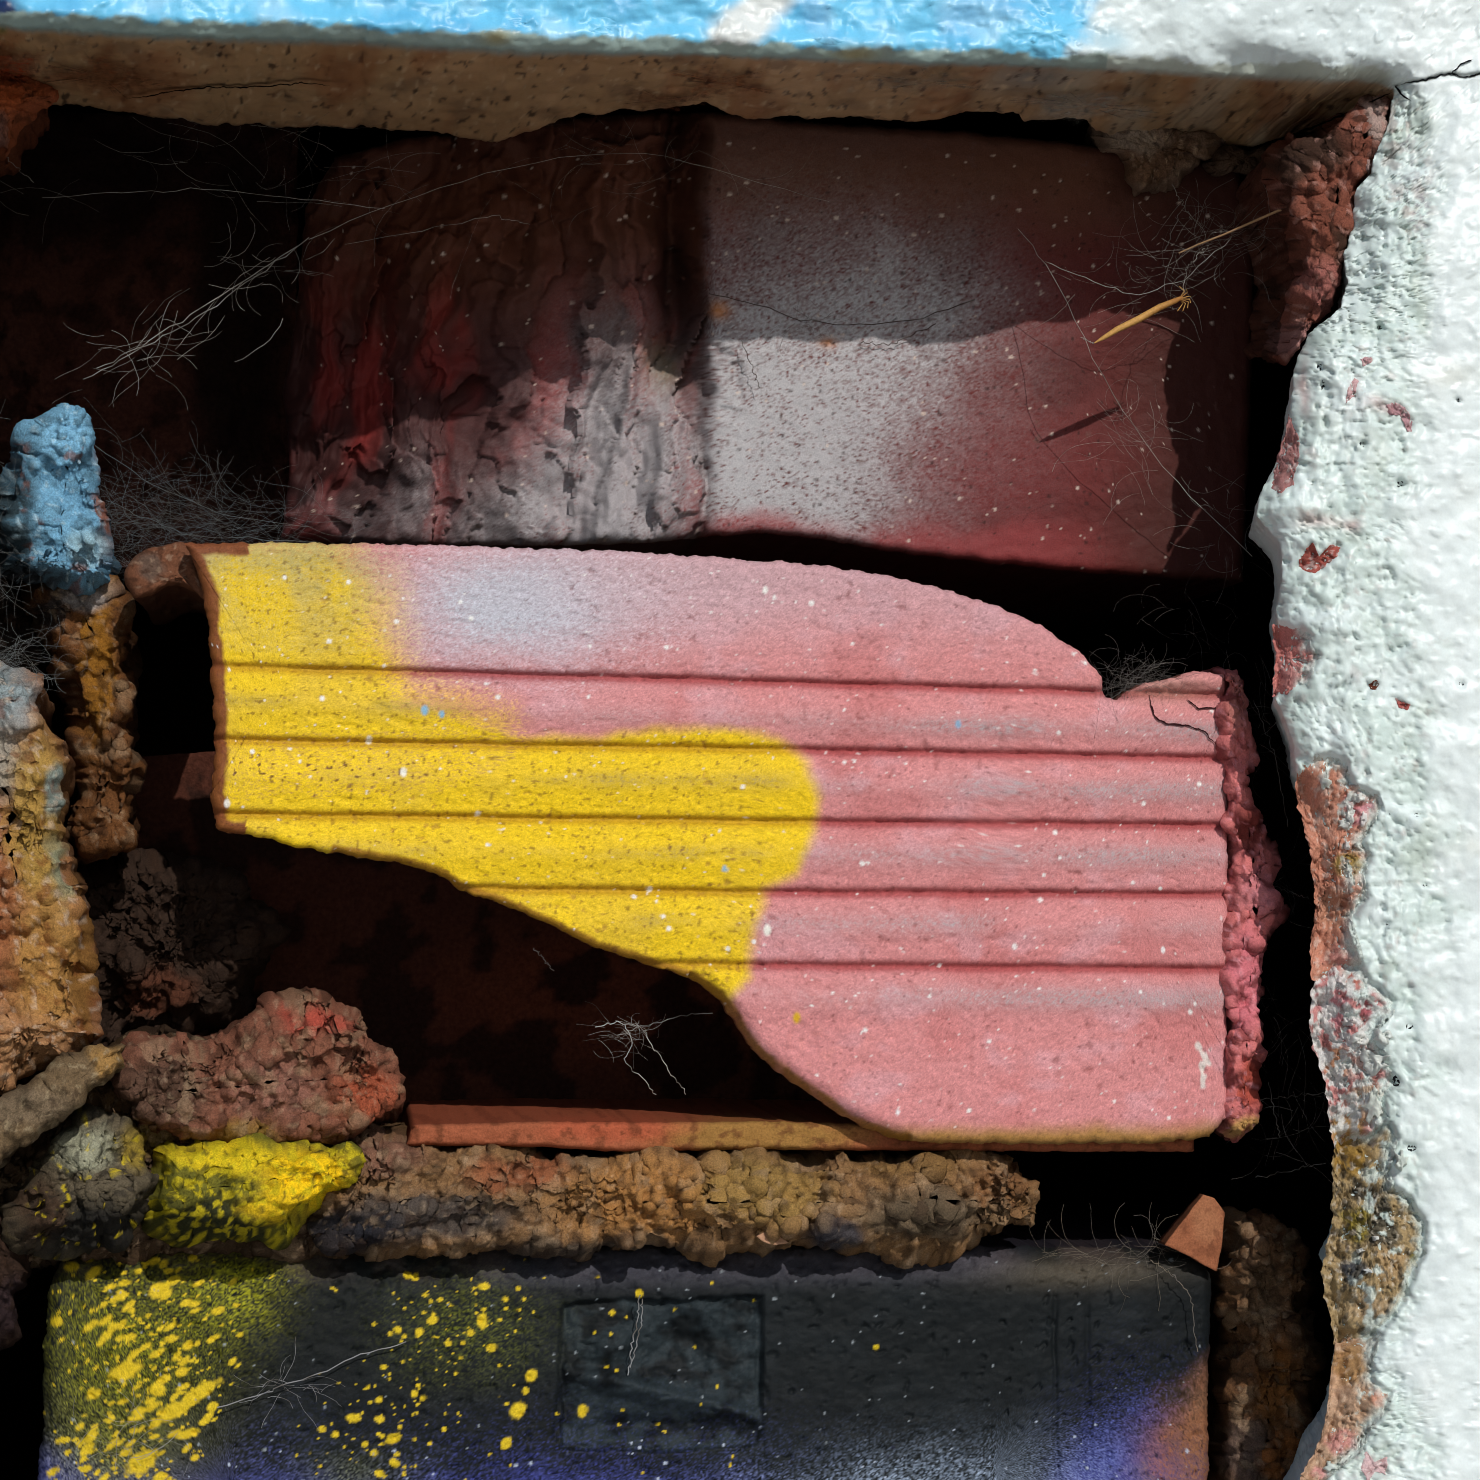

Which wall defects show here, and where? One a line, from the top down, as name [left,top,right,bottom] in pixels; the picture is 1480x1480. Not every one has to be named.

crack [1272,60,1480,143]
spalling [1235,94,1391,366]
peeling [1271,414,1300,493]
peeling [1346,357,1373,403]
peeling [1386,403,1413,432]
peeling [1299,543,1340,573]
peeling [1272,624,1321,697]
peeling [1295,751,1427,1480]
peeling [1158,1193,1225,1271]